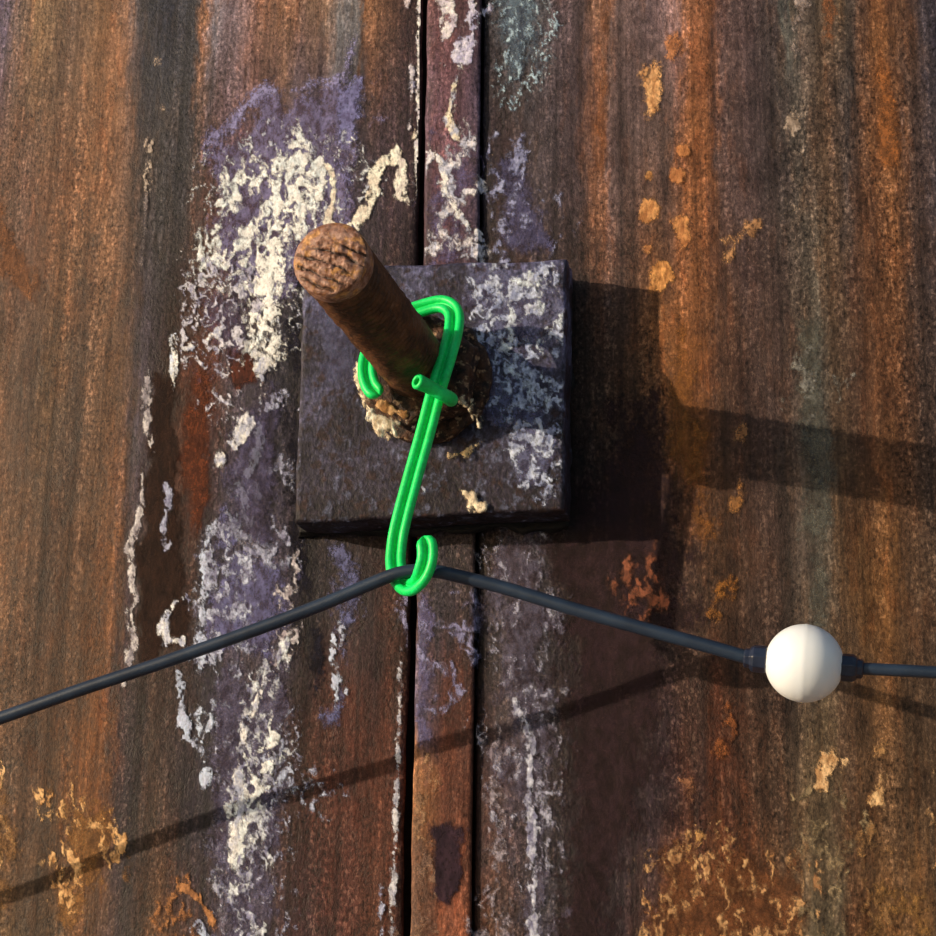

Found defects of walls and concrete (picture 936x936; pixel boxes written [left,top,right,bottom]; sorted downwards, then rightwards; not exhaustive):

rust [227,346,258,391]
rust [178,367,216,534]
rust [611,555,670,621]
peeling [34,782,127,928]